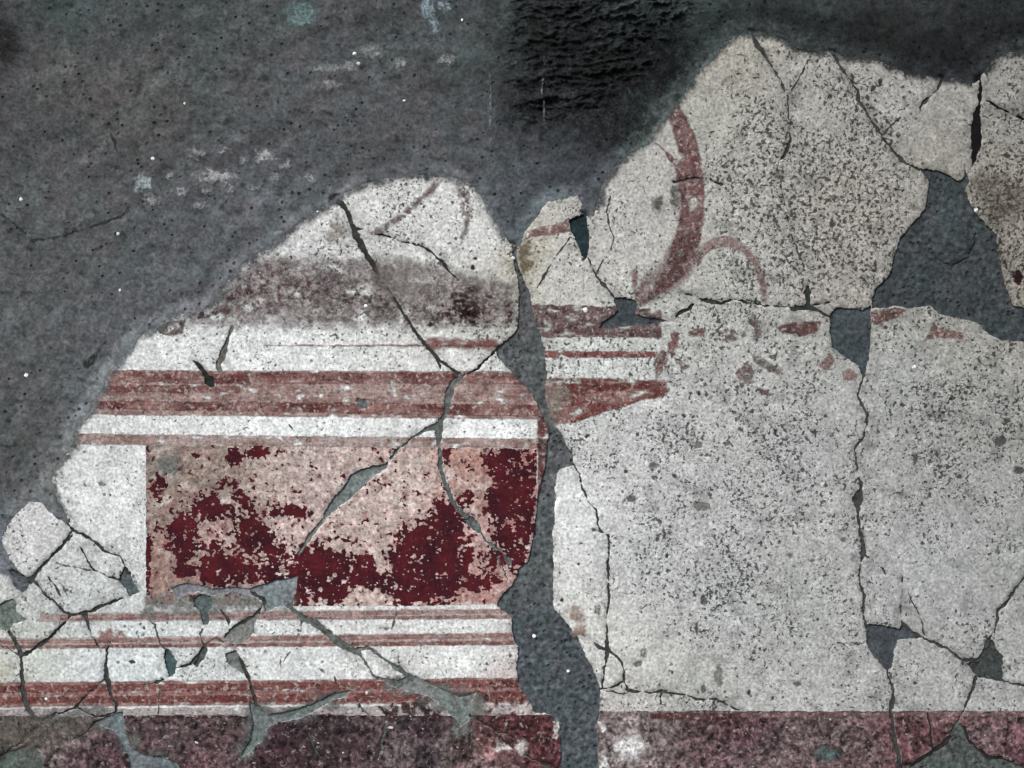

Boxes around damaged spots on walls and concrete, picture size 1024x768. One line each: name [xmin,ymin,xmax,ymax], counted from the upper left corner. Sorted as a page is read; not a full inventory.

spalling [569,213,589,259]
leakage [504,0,692,148]
crack [672,34,942,318]
spalling [830,169,1024,374]
crack [0,526,130,760]
crack [145,591,415,759]
peeling [120,243,601,768]
crack [332,197,512,585]
crack [572,463,739,711]
spalling [865,624,919,669]
crack [852,373,1024,768]
spalling [967,640,1003,681]